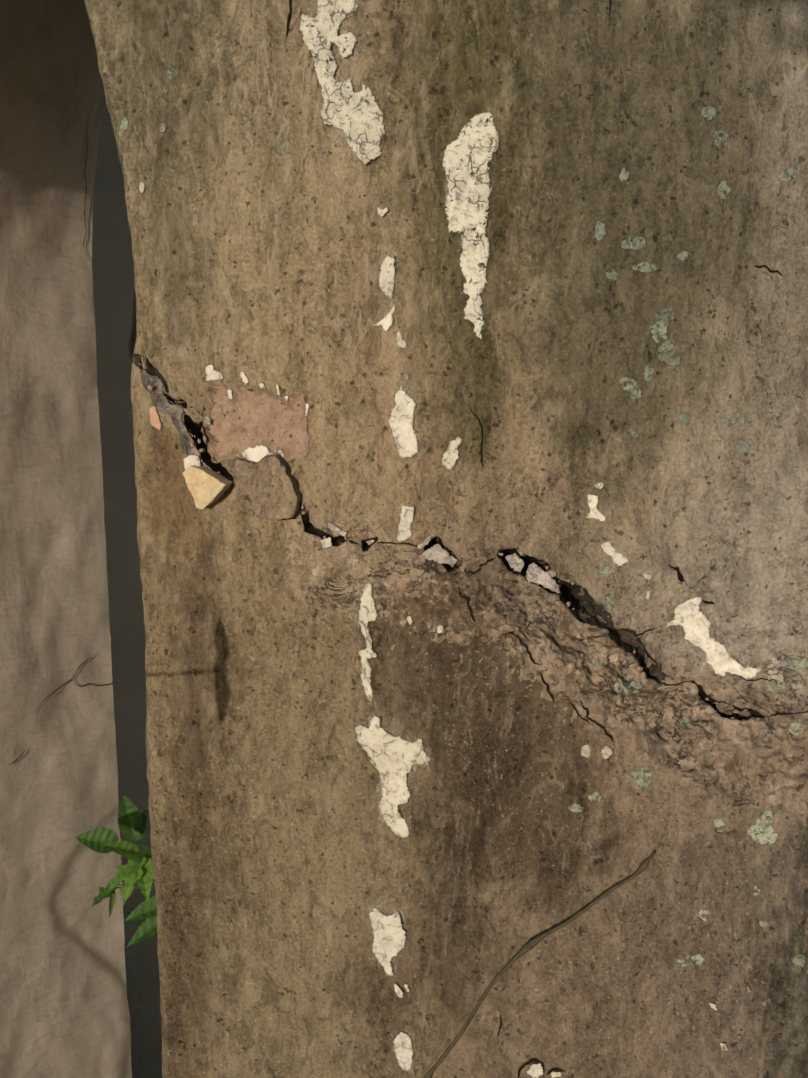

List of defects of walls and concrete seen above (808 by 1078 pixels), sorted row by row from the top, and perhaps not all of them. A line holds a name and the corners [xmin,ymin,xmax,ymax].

peeling [299,0,386,165]
peeling [437,112,499,339]
crack [133,353,233,481]
crack [469,408,483,470]
peeling [354,579,431,838]
crack [281,503,808,726]
crack [500,631,616,747]
peeling [662,592,764,678]
peeling [368,903,409,998]
damp [771,896,808,1017]
crack [517,1059,565,1078]
damp [766,1016,808,1078]